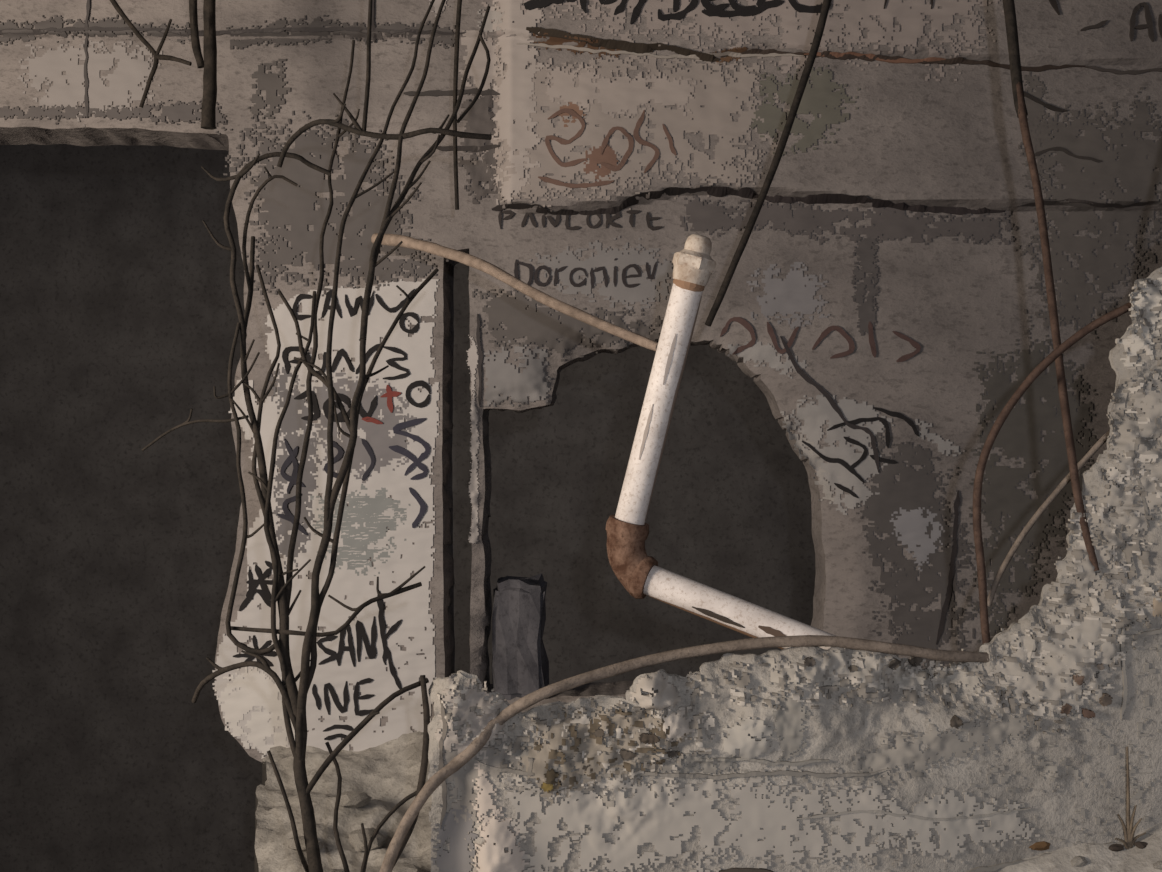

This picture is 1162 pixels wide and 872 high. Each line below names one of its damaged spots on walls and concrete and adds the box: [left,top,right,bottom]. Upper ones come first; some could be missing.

peeling [429,0,450,17]
crack [516,27,1162,112]
crack [1035,147,1102,163]
crack [492,186,1157,215]
spalling [712,0,1162,734]
peeling [212,279,1051,872]
crack [719,864,773,872]